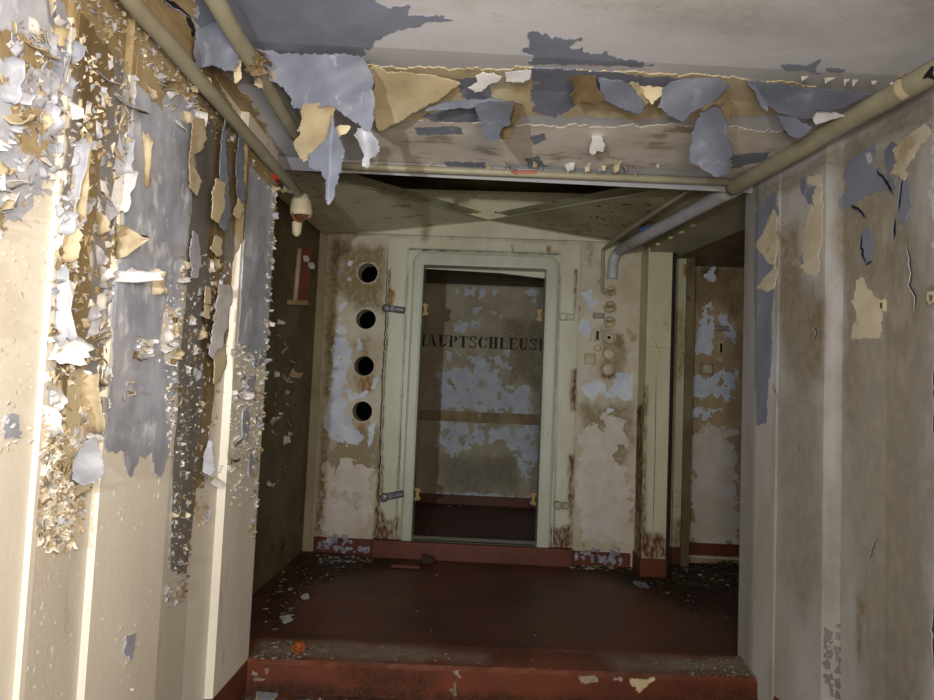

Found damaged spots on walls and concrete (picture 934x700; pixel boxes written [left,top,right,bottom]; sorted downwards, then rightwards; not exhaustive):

peeling [226,0,845,177]
peeling [838,122,934,266]
peeling [0,0,303,581]
peeling [754,191,779,426]
peeling [851,277,883,340]
peeling [316,302,379,554]
corrosion [374,441,397,539]
peeling [434,349,538,484]
corrosion [550,455,574,548]
corrosion [635,393,665,559]
peeling [689,368,740,545]
crack [926,364,934,434]